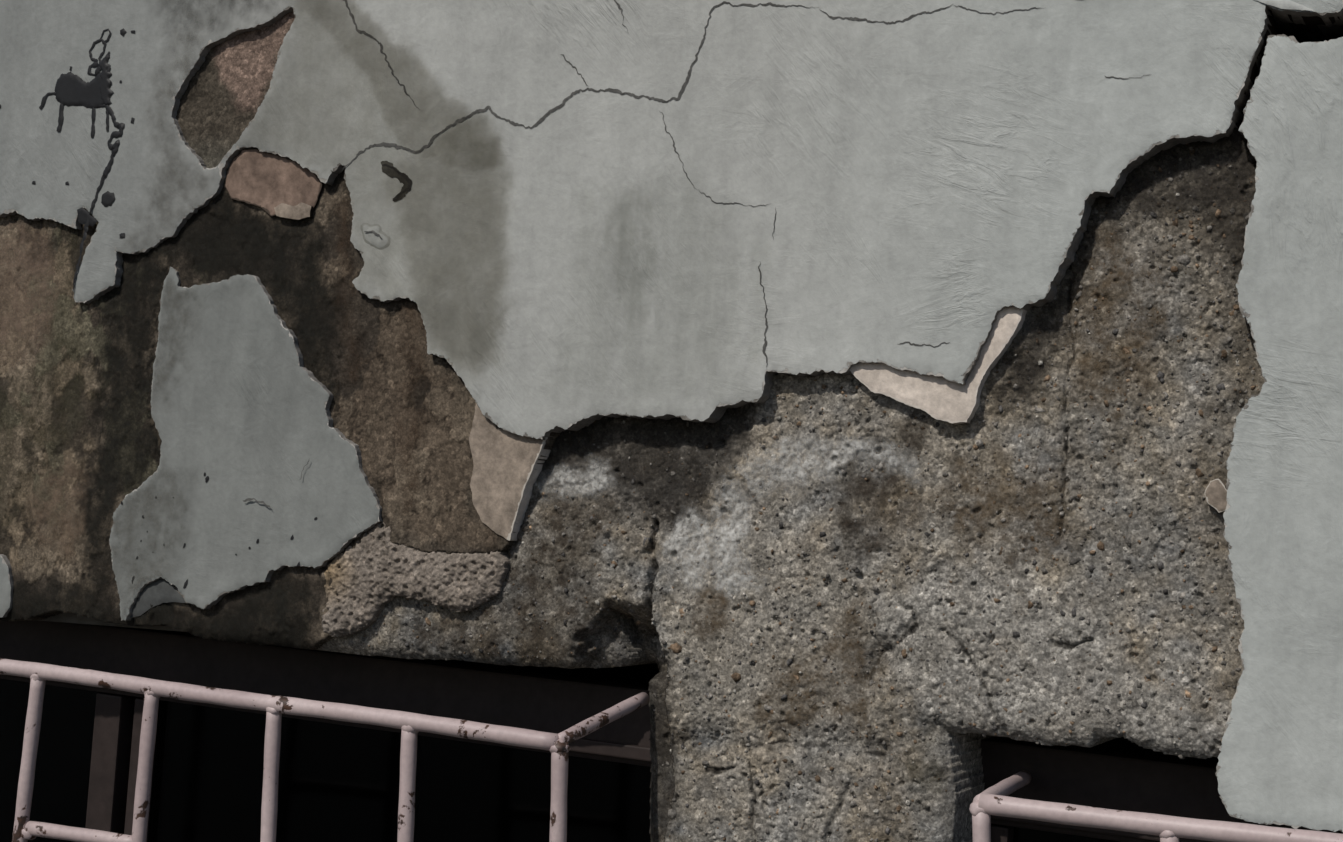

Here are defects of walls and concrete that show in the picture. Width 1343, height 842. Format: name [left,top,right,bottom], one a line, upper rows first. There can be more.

spalling [176,11,295,169]
crack [342,0,1038,367]
crack [1235,0,1343,128]
peeling [0,209,246,626]
spalling [170,128,1265,842]